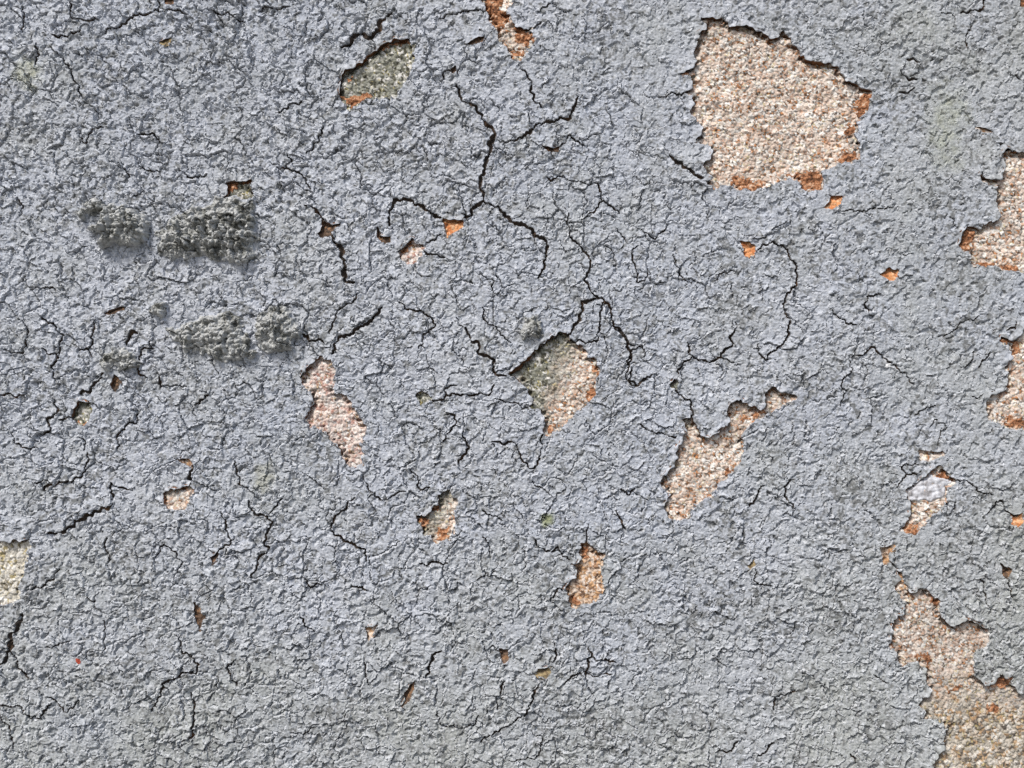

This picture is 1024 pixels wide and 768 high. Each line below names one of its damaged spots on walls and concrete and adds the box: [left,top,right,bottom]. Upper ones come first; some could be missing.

peeling [333,33,416,111]
peeling [464,0,536,61]
peeling [679,12,872,209]
crack [278,126,436,354]
crack [388,70,798,439]
peeling [954,142,1024,273]
crack [5,317,104,492]
crack [47,483,130,535]
crack [431,277,549,494]
peeling [655,383,797,521]
peeling [880,446,1024,768]
crack [436,643,616,762]